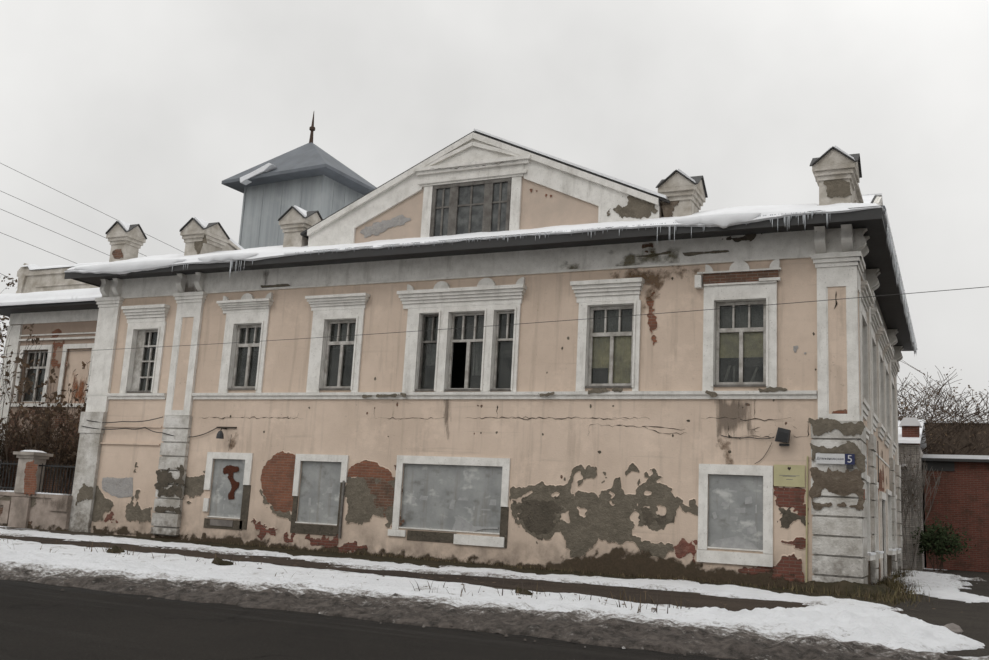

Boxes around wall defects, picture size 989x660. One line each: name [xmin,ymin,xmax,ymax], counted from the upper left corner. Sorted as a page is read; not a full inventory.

flaking render [607,195,680,219]
flaking render [823,179,852,198]
peeling [645,290,659,346]
flaking render [0,402,206,524]
flaking render [204,450,457,553]
crack [376,402,809,440]
peeling [499,462,698,562]
leakage [717,400,749,464]
flaking render [738,409,866,583]
flaking render [877,447,888,496]